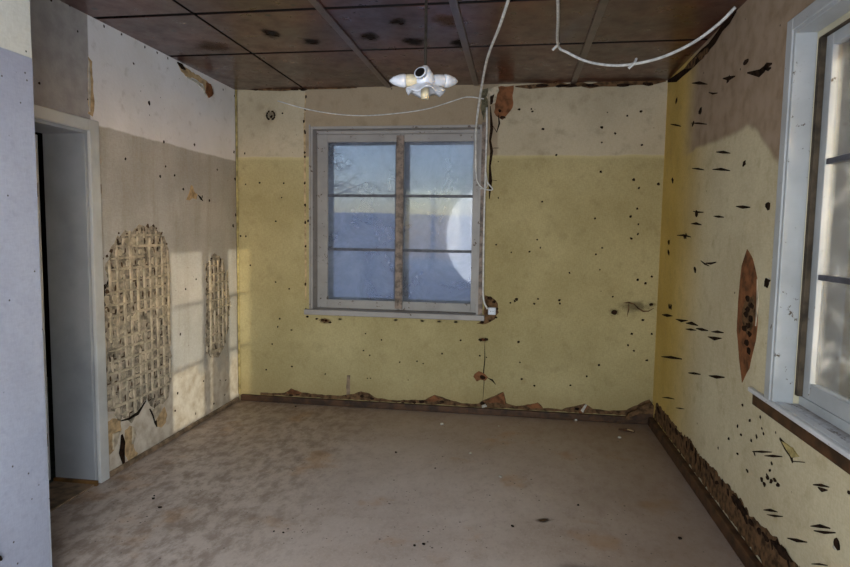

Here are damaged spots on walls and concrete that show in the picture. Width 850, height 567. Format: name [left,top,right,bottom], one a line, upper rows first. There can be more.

peeling [177,62,214,98]
flaking render [481,85,514,120]
flaking render [103,224,172,464]
flaking render [205,253,231,358]
flaking render [477,295,499,324]
spalling [662,314,724,341]
flaking render [737,249,771,382]
flaking render [473,349,496,394]